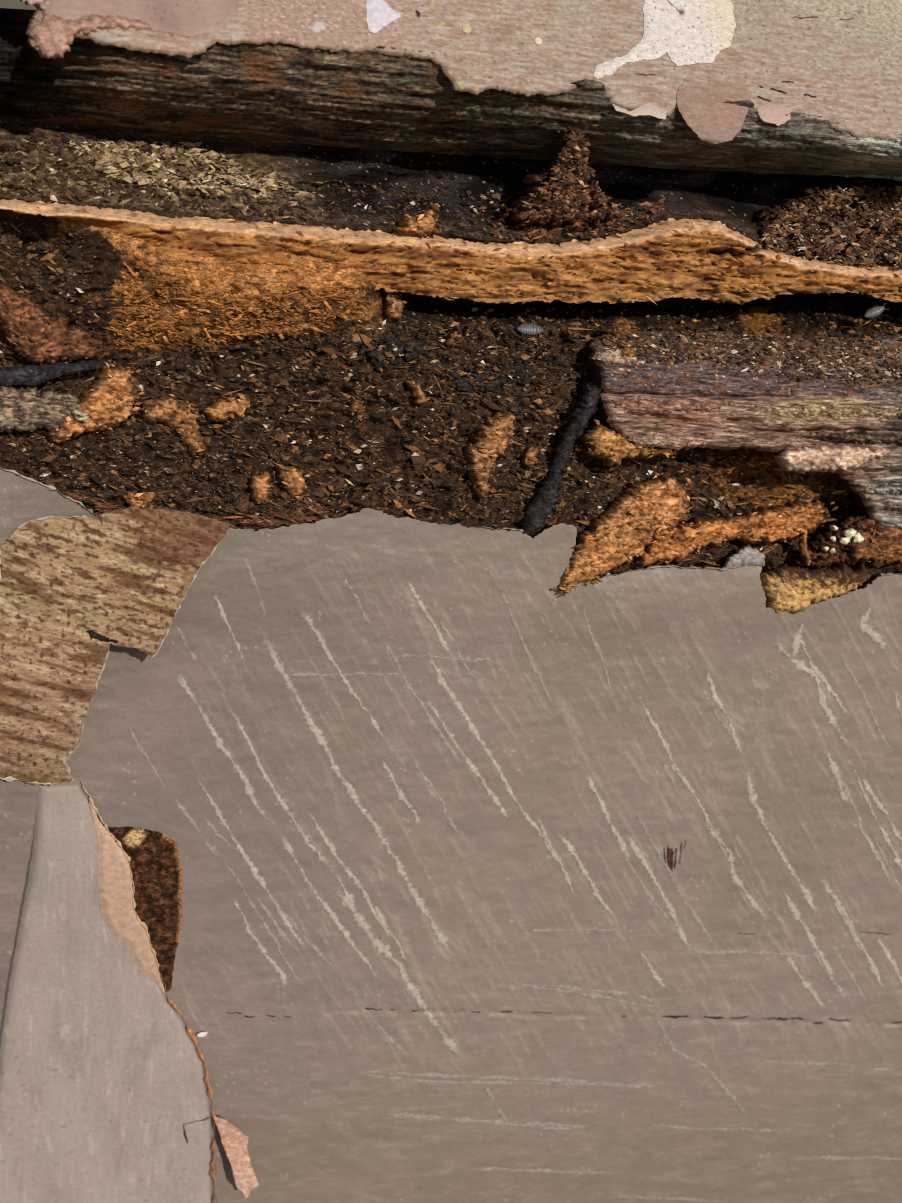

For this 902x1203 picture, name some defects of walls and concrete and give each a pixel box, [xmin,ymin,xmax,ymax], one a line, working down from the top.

peeling [0,0,152,58]
spalling [0,117,902,531]
spalling [529,411,860,575]
spalling [848,562,902,589]
peeling [0,501,259,1203]
crack [662,1015,850,1024]